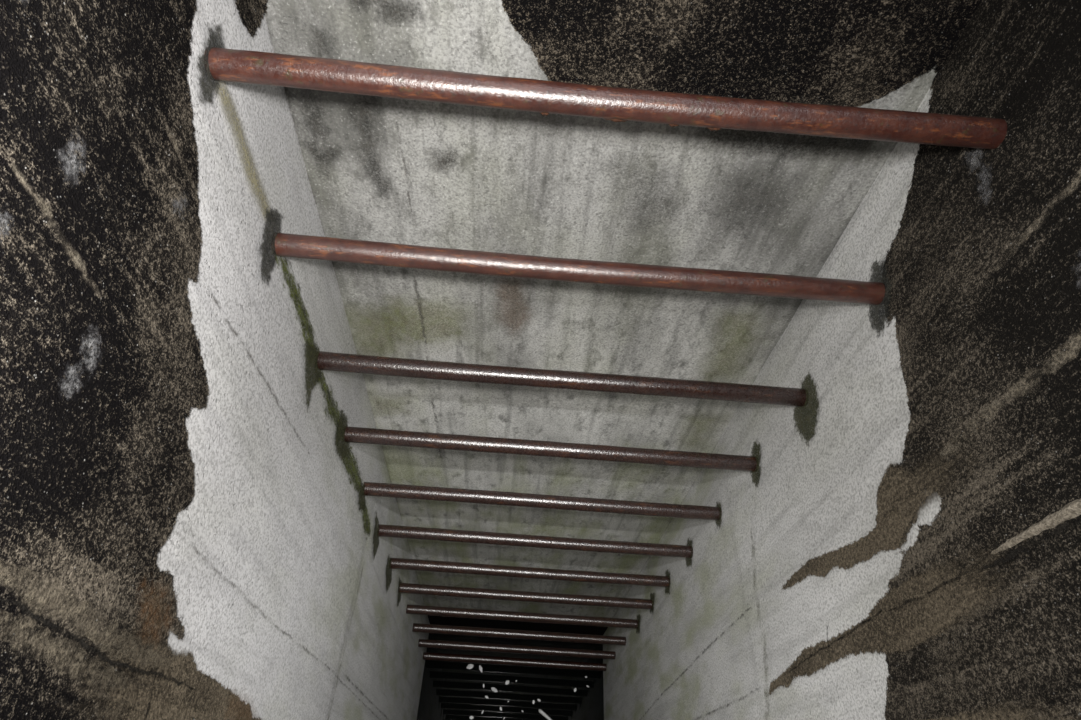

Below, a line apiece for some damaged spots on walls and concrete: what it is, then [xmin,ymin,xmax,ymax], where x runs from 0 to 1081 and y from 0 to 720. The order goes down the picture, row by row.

leakage [352,94,389,192]
leakage [702,128,870,156]
leakage [304,341,321,409]
leakage [793,373,819,445]